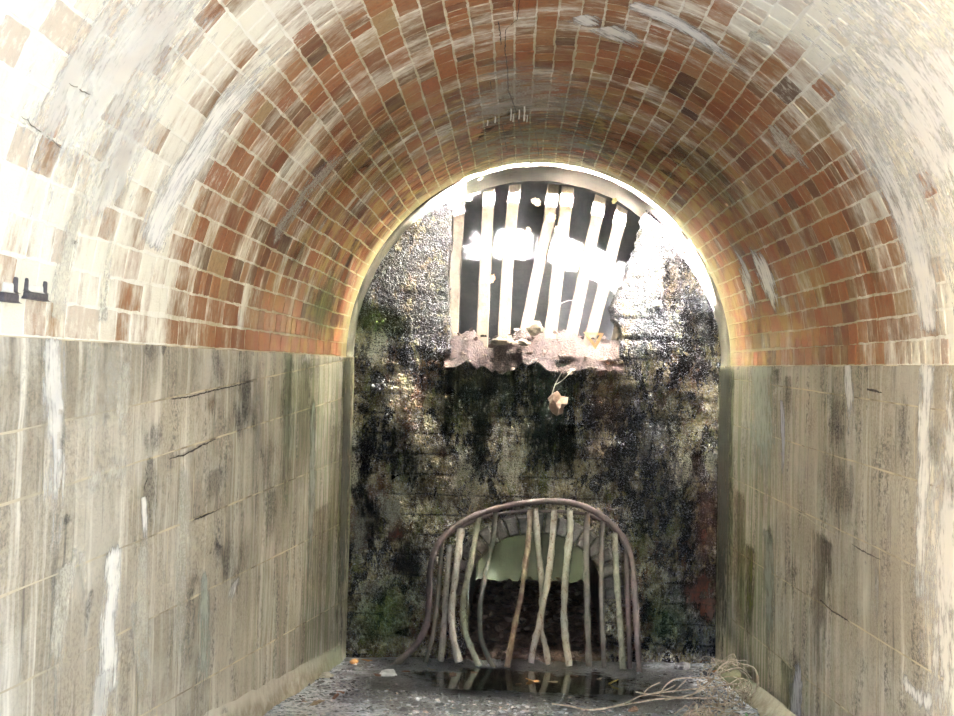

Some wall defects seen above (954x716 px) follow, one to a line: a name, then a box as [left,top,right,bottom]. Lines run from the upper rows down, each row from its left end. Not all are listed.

crack [490,0,539,156]
crack [170,439,216,459]
crack [172,381,253,400]
water stain [335,69,734,648]
water stain [86,546,121,716]